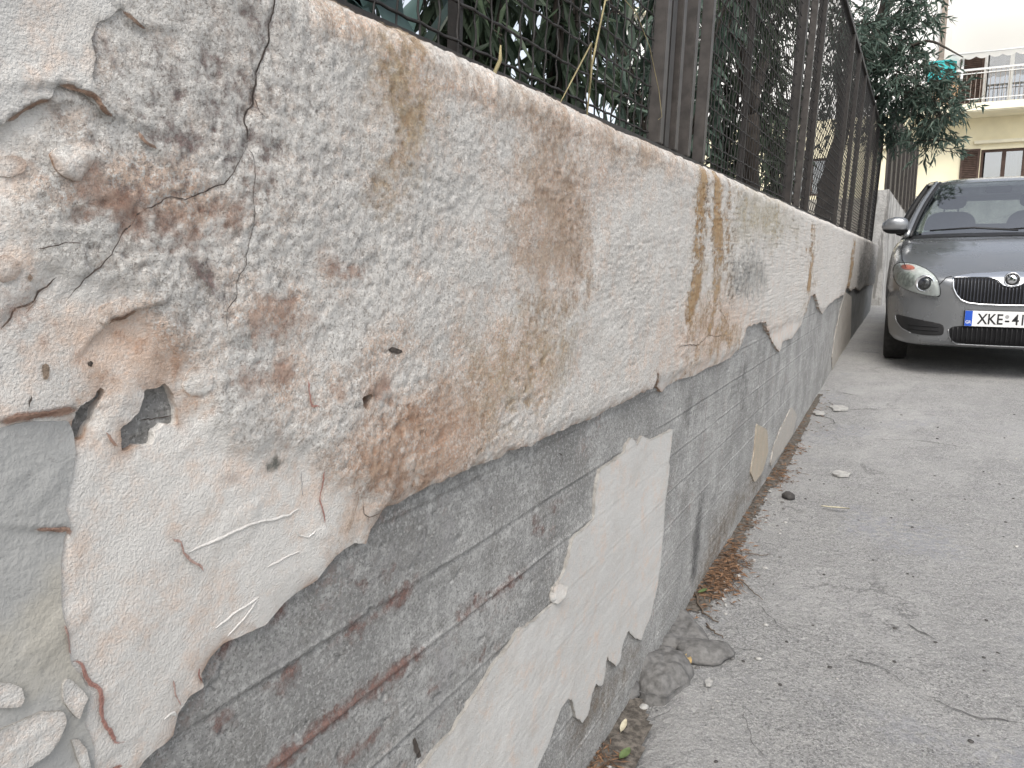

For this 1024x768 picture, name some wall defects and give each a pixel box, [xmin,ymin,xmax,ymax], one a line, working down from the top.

peeling [0,391,119,768]
crack [1,0,275,329]
spalling [107,385,171,448]
spalling [139,284,873,768]
rust [686,167,740,364]